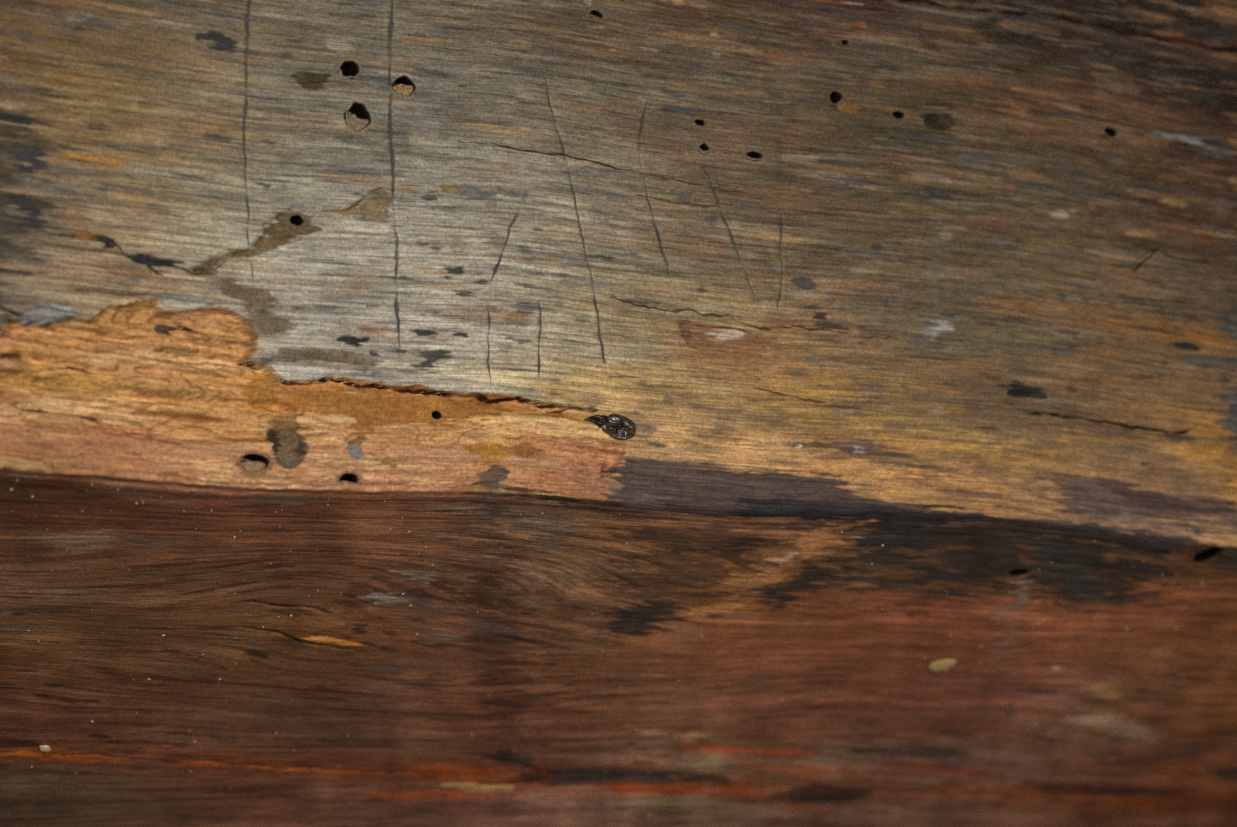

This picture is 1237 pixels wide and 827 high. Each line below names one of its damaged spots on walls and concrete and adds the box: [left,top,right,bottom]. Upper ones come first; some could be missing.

peeling [158,292,232,311]
peeling [10,304,81,326]